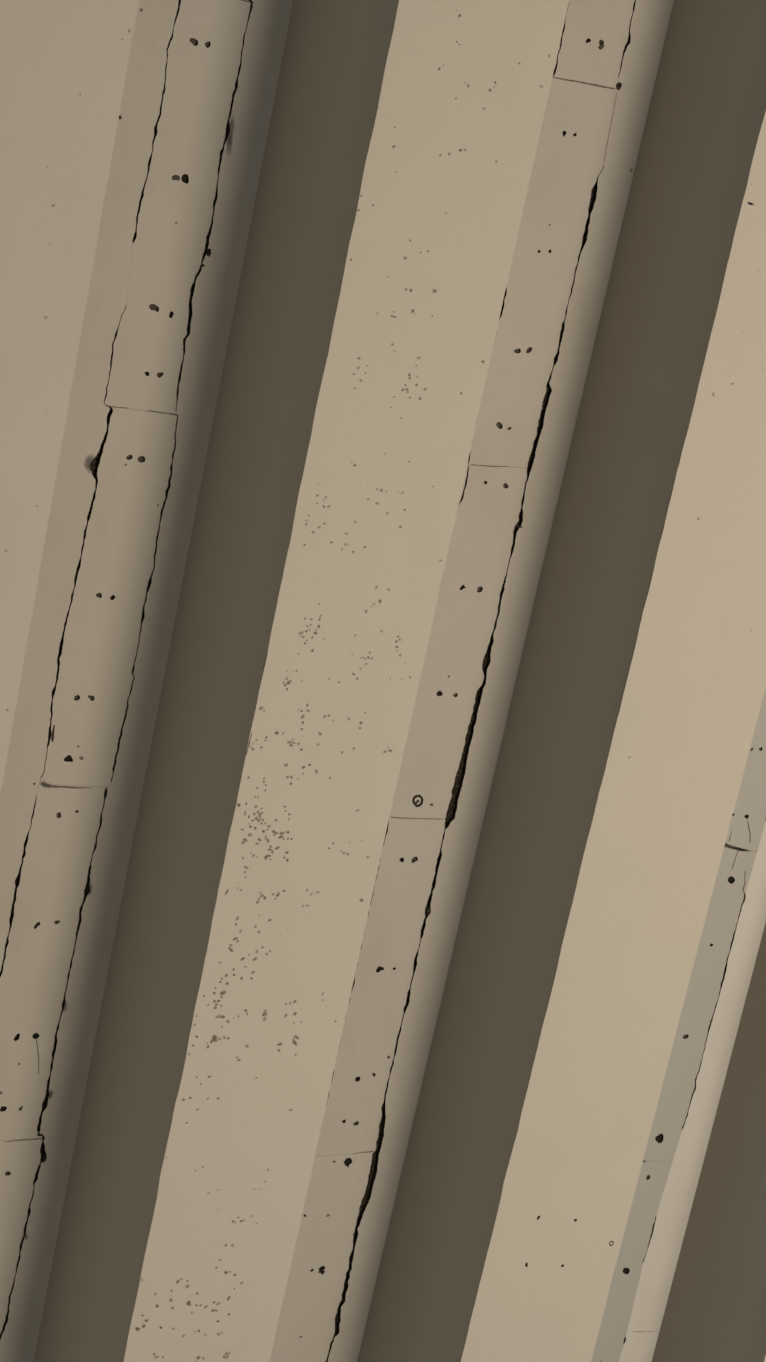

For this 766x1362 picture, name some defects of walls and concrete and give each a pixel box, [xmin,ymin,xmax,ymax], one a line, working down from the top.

crack [661,434,687,533]
crack [0,0,254,1340]
crack [326,0,636,1362]
crack [610,574,652,738]
crack [682,821,751,1129]